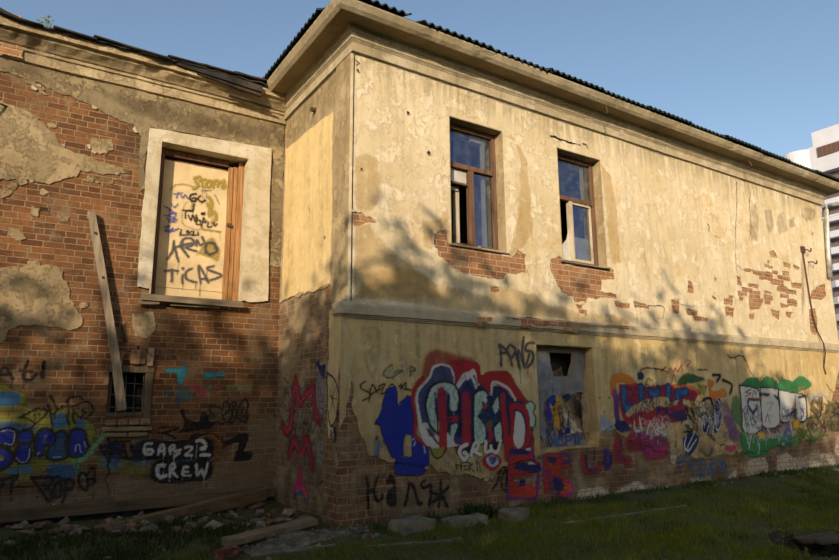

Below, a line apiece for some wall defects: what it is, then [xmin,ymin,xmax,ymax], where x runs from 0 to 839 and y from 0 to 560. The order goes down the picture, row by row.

spalling [0,41,23,59]
spalling [351,209,376,226]
spalling [0,72,278,509]
spalling [434,229,528,293]
spalling [505,256,649,333]
spalling [671,299,708,322]
spalling [712,250,802,320]
spalling [809,284,826,335]
spalling [333,369,839,527]